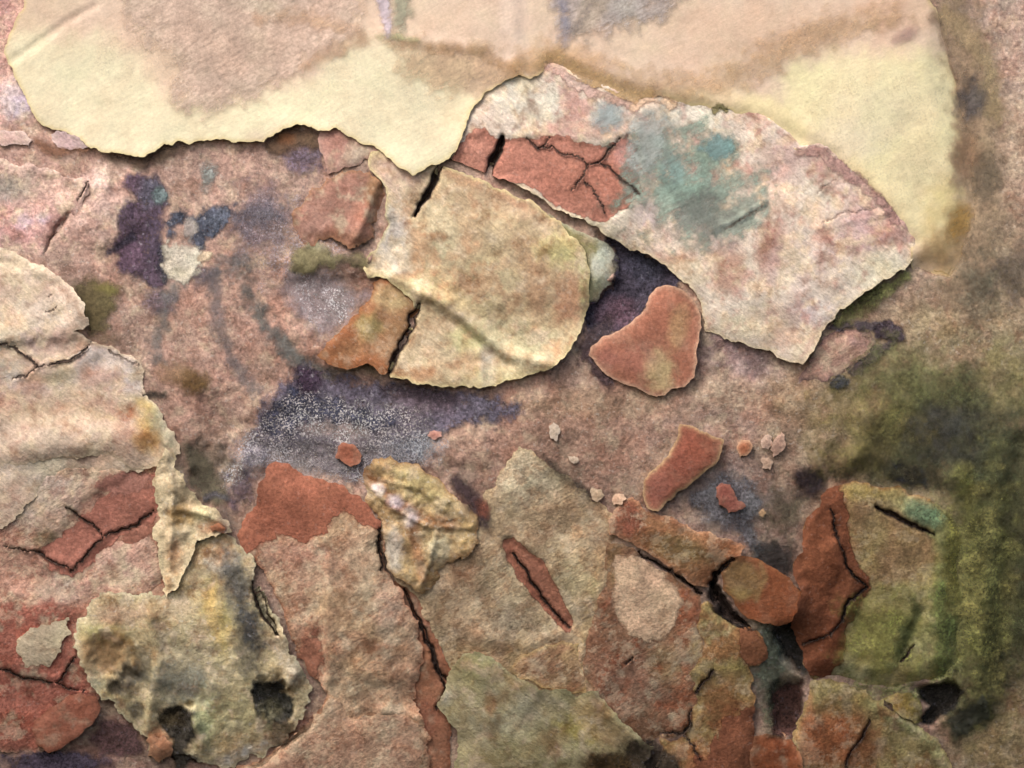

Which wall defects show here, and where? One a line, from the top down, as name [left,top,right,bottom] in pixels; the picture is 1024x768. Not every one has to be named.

crack [414,164,442,217]
peeling [4,0,975,397]
crack [486,135,640,214]
crack [388,303,421,375]
damp [828,319,905,390]
flaking render [0,130,181,753]
crack [3,507,154,573]
crack [638,550,749,627]
crack [404,588,447,711]
damp [891,598,919,667]
damp [917,581,1010,741]
spalling [146,735,173,762]